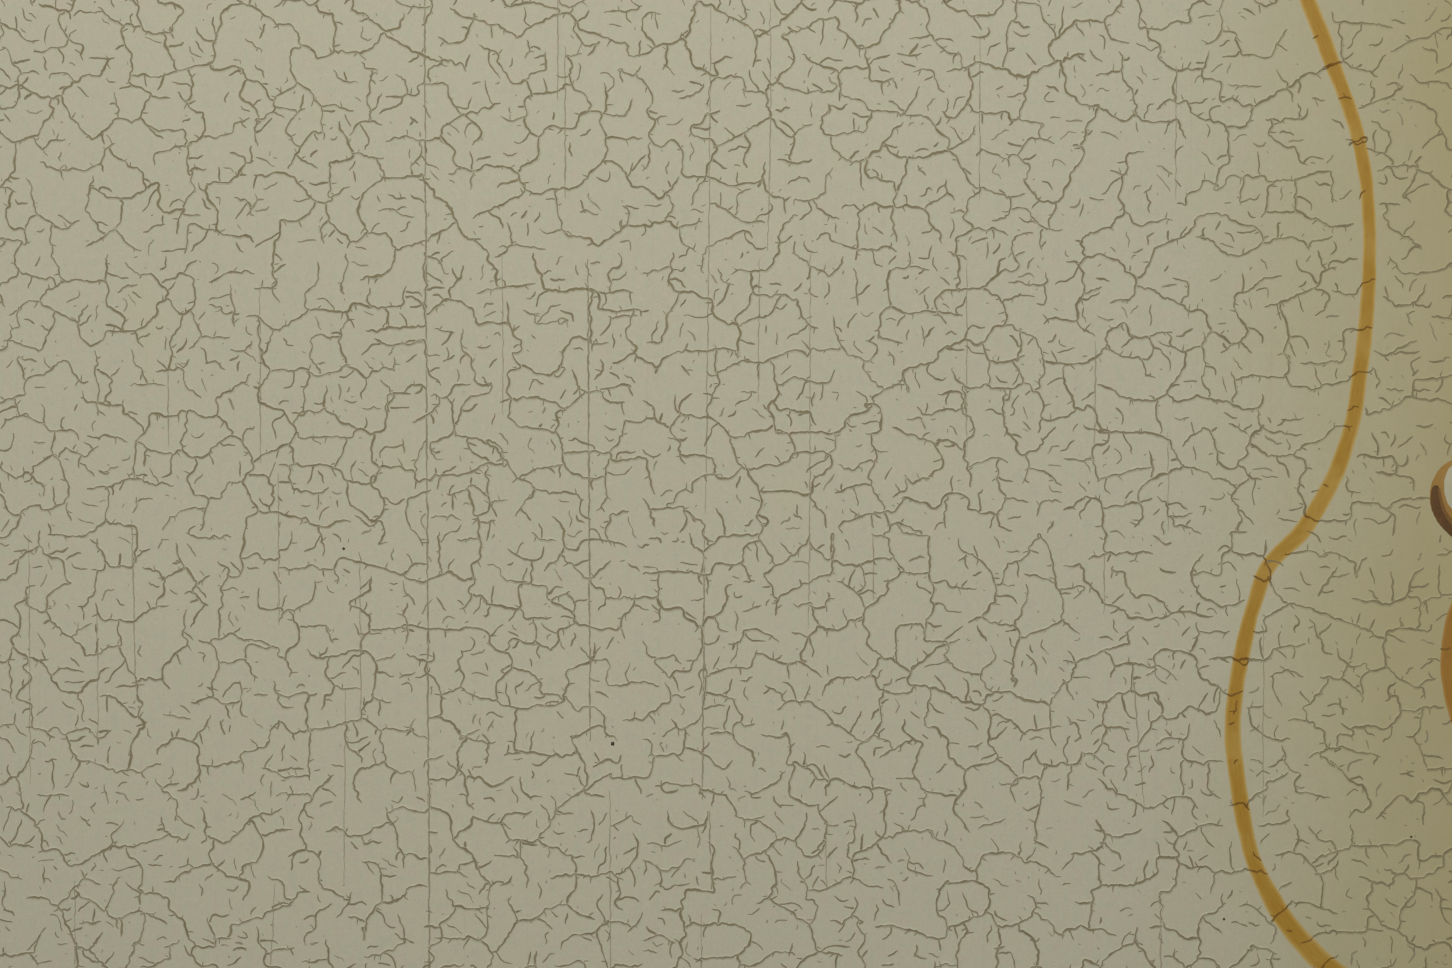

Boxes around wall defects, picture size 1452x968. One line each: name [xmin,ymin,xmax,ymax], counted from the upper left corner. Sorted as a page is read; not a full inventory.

crack [377,192,425,232]
crack [1346,97,1452,291]
crack [208,284,239,327]
crack [209,263,254,284]
crack [851,268,870,305]
crack [1382,283,1452,340]
crack [130,349,165,388]
crack [1285,531,1367,596]
crack [1229,701,1330,810]
crack [574,809,642,843]
crack [0,868,22,931]
crack [302,895,354,968]